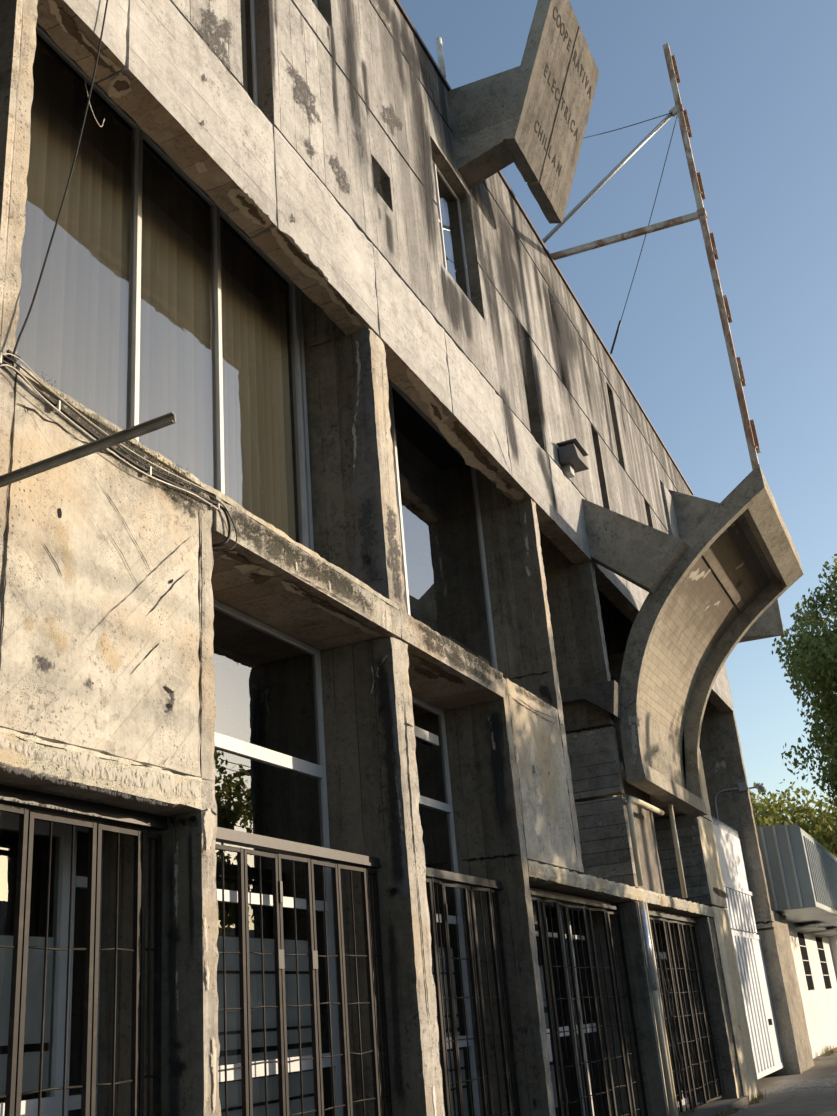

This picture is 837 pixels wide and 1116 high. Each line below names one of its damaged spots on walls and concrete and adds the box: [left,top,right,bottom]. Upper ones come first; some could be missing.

peeling [47,0,132,98]
spalling [190,0,233,71]
spalling [287,66,350,194]
damp [327,0,370,162]
damp [387,11,437,247]
peeling [228,189,361,326]
peeling [352,340,361,471]
peeling [406,368,524,500]
damp [463,178,545,422]
damp [502,390,519,460]
damp [538,448,557,507]
damp [534,266,626,453]